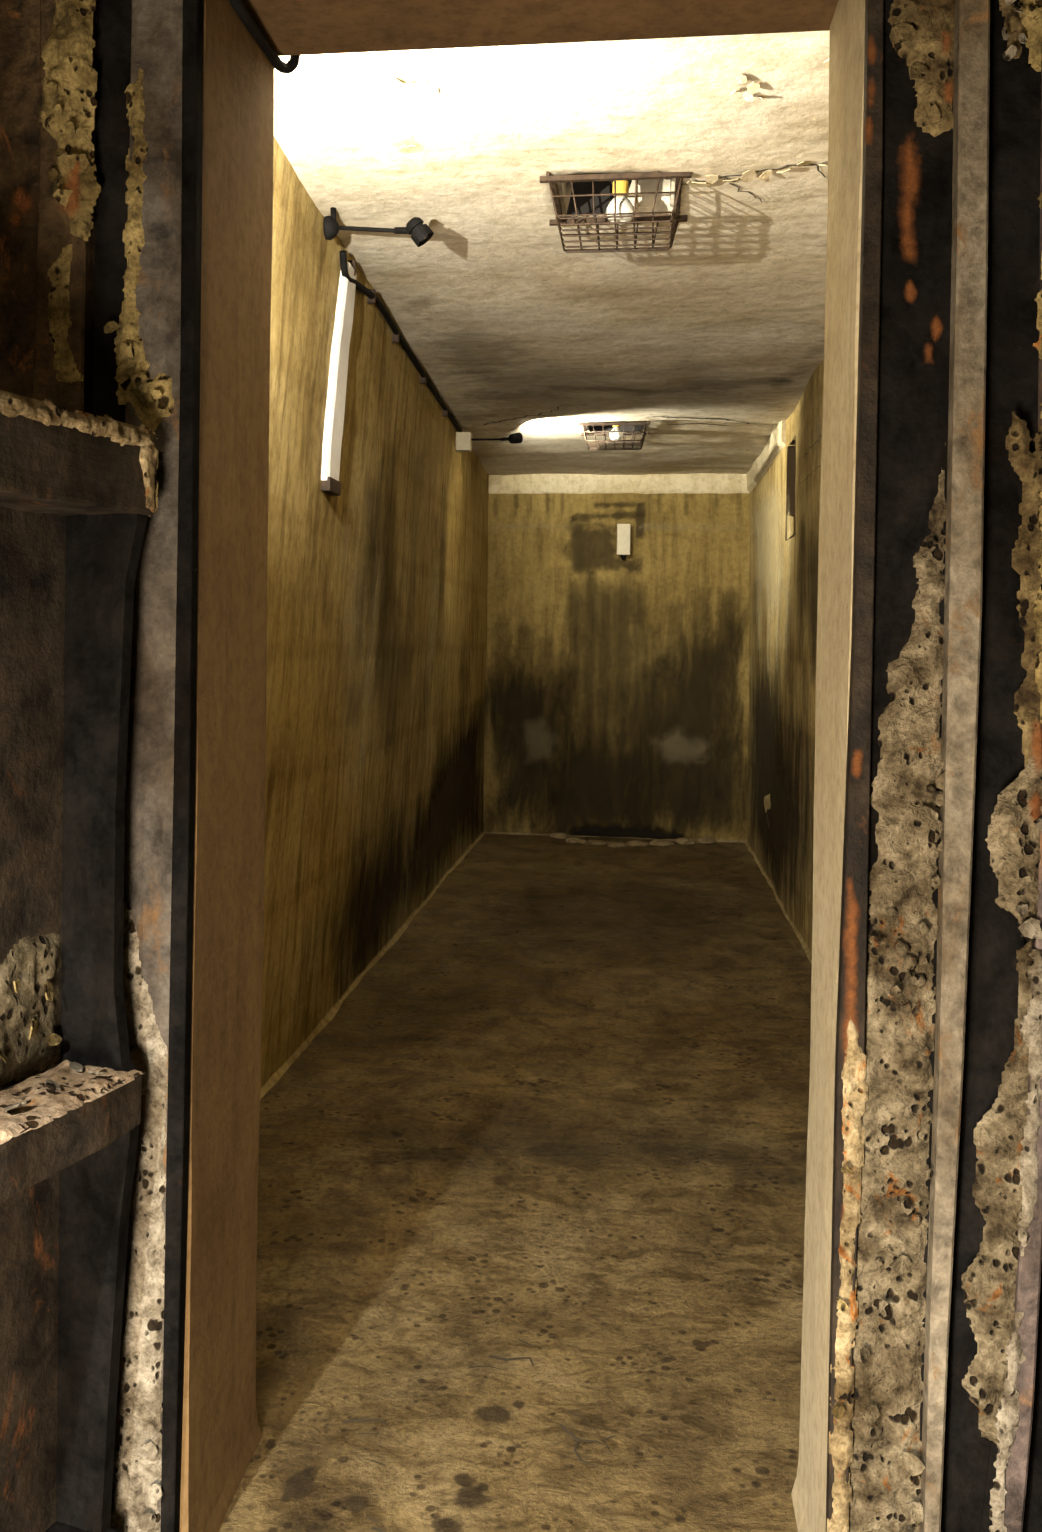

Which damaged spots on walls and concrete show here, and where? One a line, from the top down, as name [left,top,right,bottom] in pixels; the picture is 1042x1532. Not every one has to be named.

peeling [36,0,101,383]
peeling [0,68,174,517]
corrosion [903,144,917,255]
corrosion [926,319,941,354]
peeling [999,0,1042,72]
peeling [1033,250,1042,378]
leakage [333,616,809,999]
peeling [827,470,947,1532]
peeling [961,403,1042,1532]
peeling [0,900,168,1532]